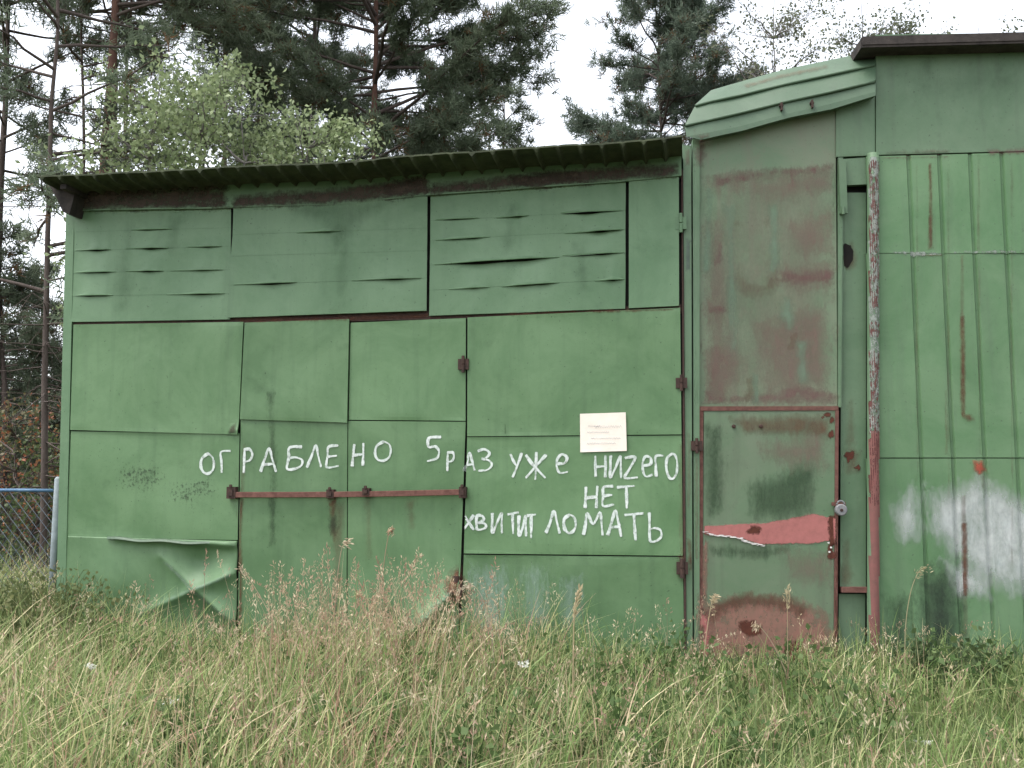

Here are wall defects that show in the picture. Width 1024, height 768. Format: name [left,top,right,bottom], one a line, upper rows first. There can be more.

rust [961,317,971,419]
rust [739,620,761,636]
peeling [697,514,837,662]